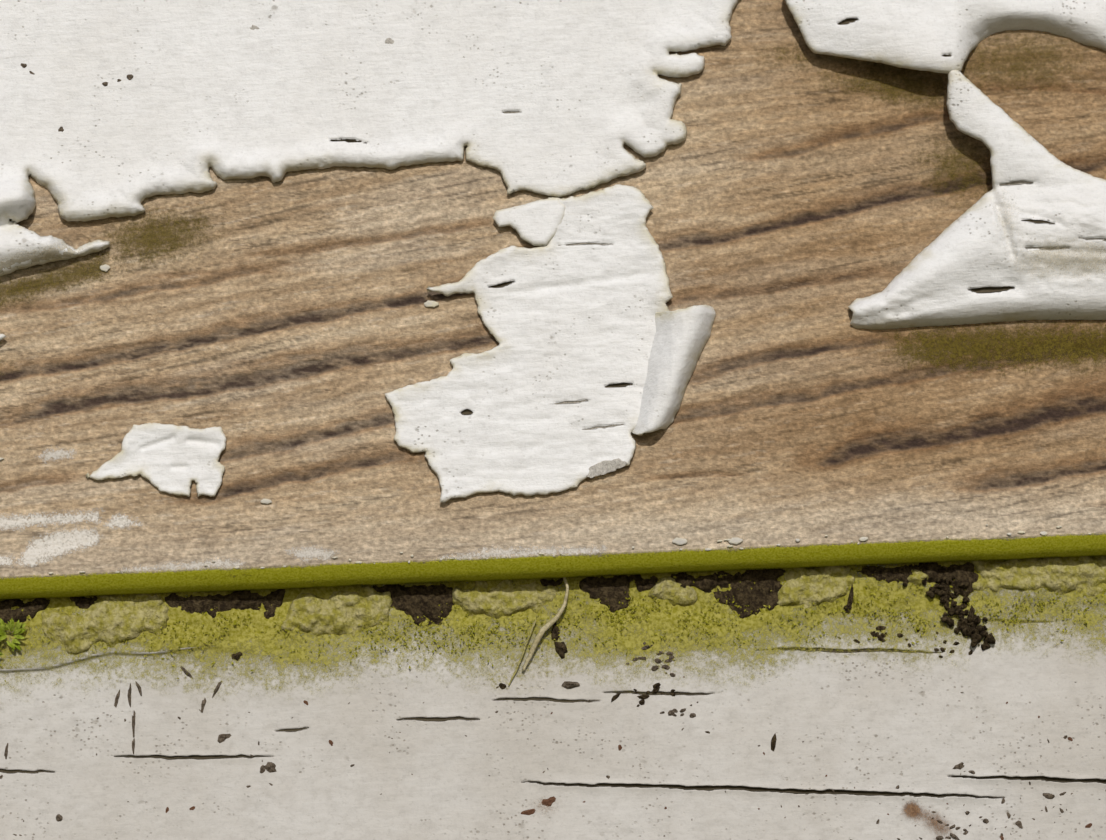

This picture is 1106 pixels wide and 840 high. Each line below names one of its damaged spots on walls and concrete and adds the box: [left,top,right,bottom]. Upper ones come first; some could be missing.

peeling [785,0,1106,330]
peeling [0,0,738,503]
crack [495,691,712,703]
crack [397,715,477,723]
crack [114,727,309,760]
crack [525,776,1106,798]